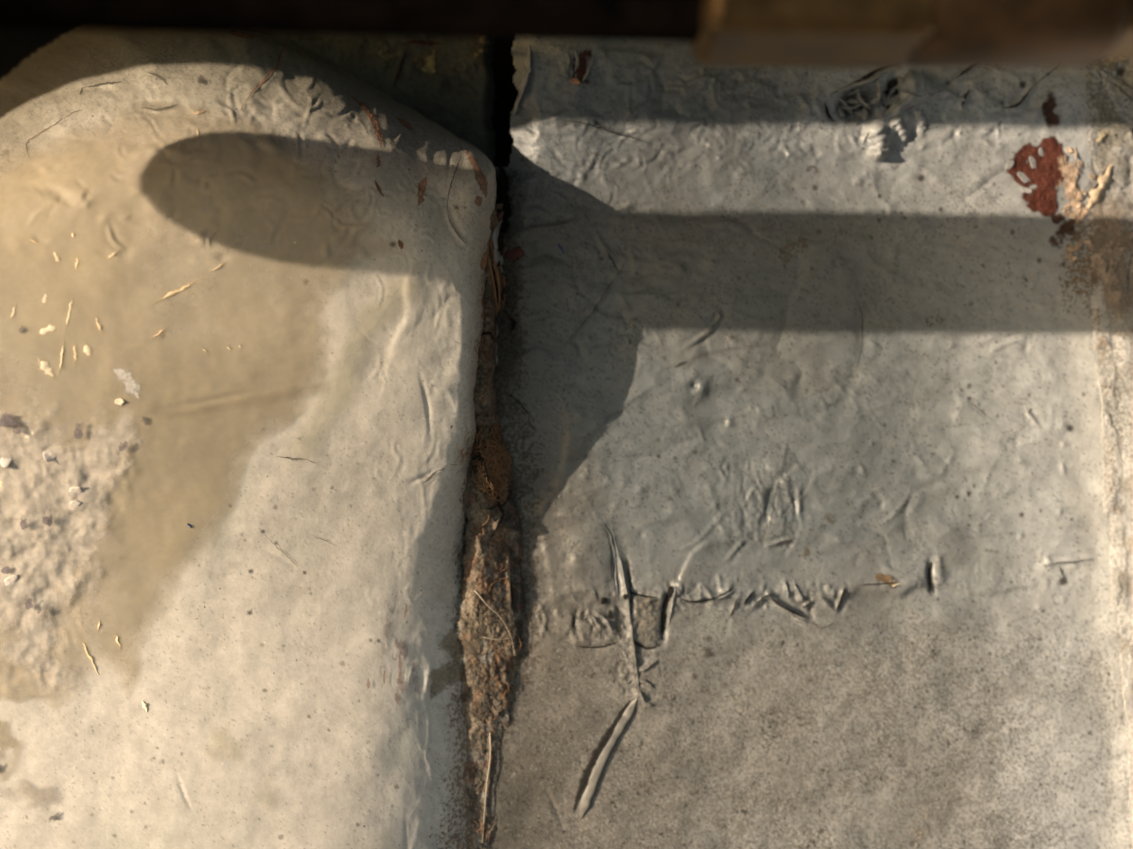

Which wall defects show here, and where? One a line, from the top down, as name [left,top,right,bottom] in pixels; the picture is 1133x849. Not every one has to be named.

rust [1041,92,1060,126]
crack [481,158,516,341]
leakage [0,130,348,667]
crack [477,430,513,615]
leakage [0,598,65,698]